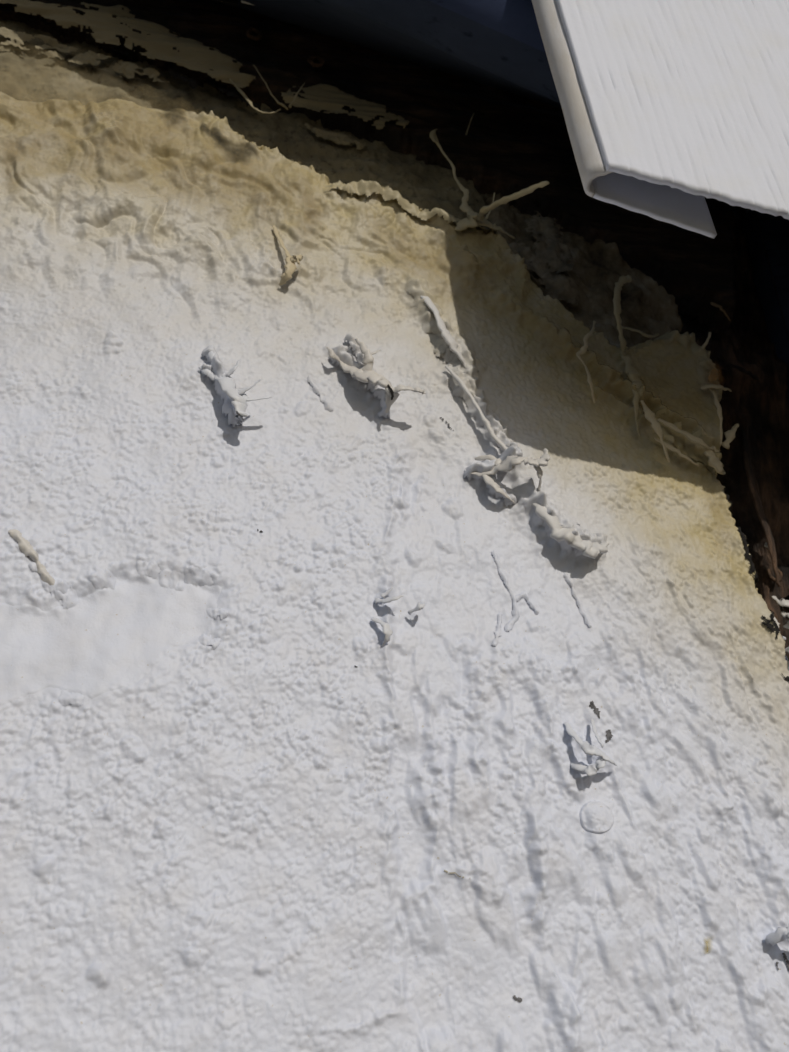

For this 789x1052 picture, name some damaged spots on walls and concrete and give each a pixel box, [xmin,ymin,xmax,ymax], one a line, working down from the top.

damp [201,124,253,173]
spalling [0,0,725,475]
peeling [464,442,551,507]